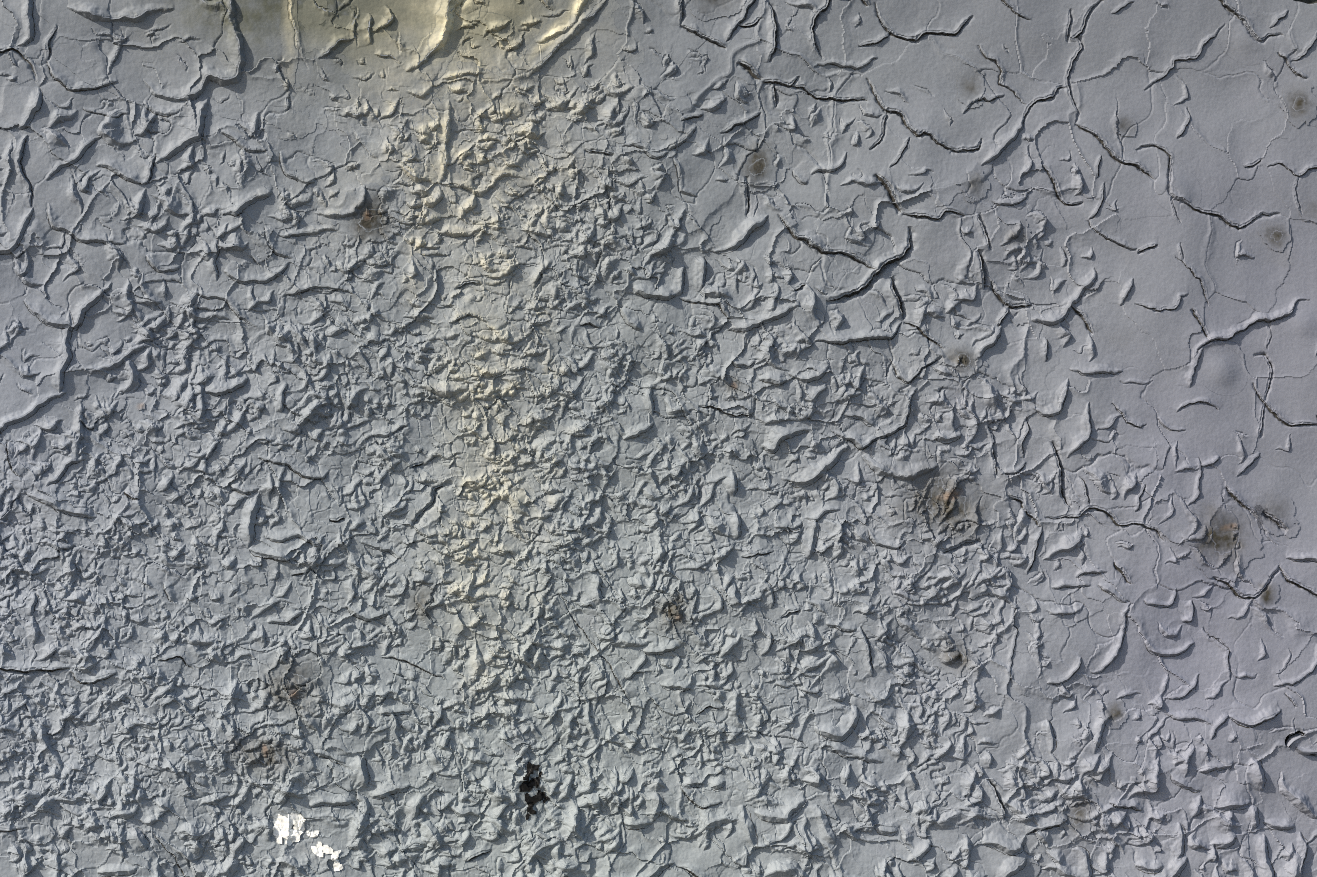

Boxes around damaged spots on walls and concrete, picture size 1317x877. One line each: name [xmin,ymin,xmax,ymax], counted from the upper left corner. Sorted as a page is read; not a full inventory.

crack [0,25,113,92]
crack [14,135,33,208]
crack [679,0,1317,451]
crack [409,461,446,525]
peeling [0,86,1167,877]
crack [989,417,1166,574]
crack [291,568,308,576]
crack [1213,564,1317,599]
crack [0,665,117,685]
crack [780,607,873,677]
peeling [1205,597,1317,699]
peeling [1118,673,1317,877]